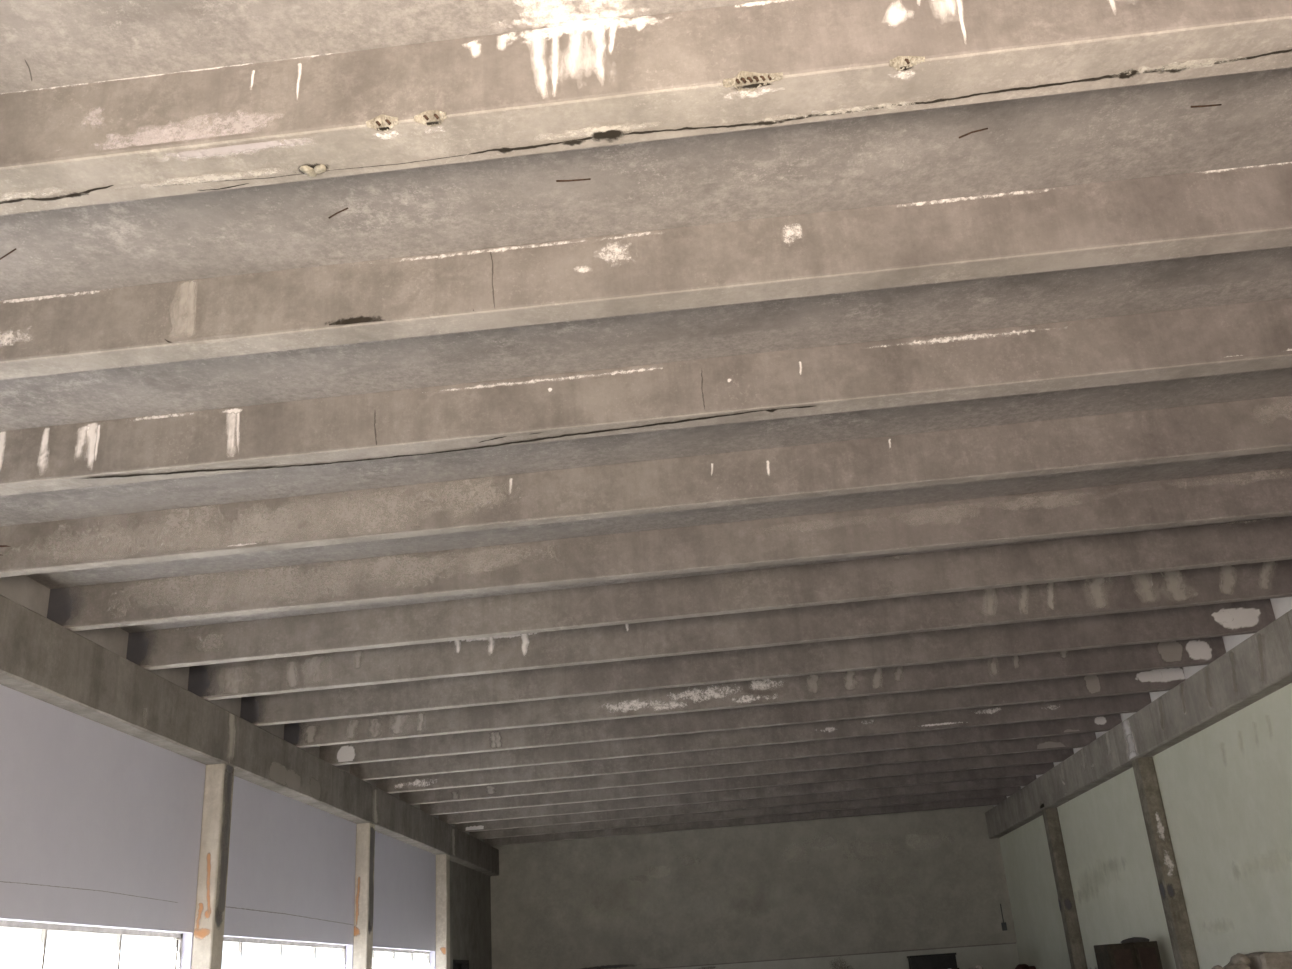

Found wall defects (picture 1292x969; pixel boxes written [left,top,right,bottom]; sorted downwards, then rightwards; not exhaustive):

leakage [888,0,920,25]
leakage [465,41,480,56]
leakage [498,0,657,93]
spalling [723,71,783,98]
spalling [366,110,447,139]
crack [154,49,1292,191]
crack [0,185,113,204]
leakage [910,330,1034,344]
leakage [447,368,662,392]
leakage [39,428,49,469]
leakage [76,423,100,465]
leakage [223,408,242,451]